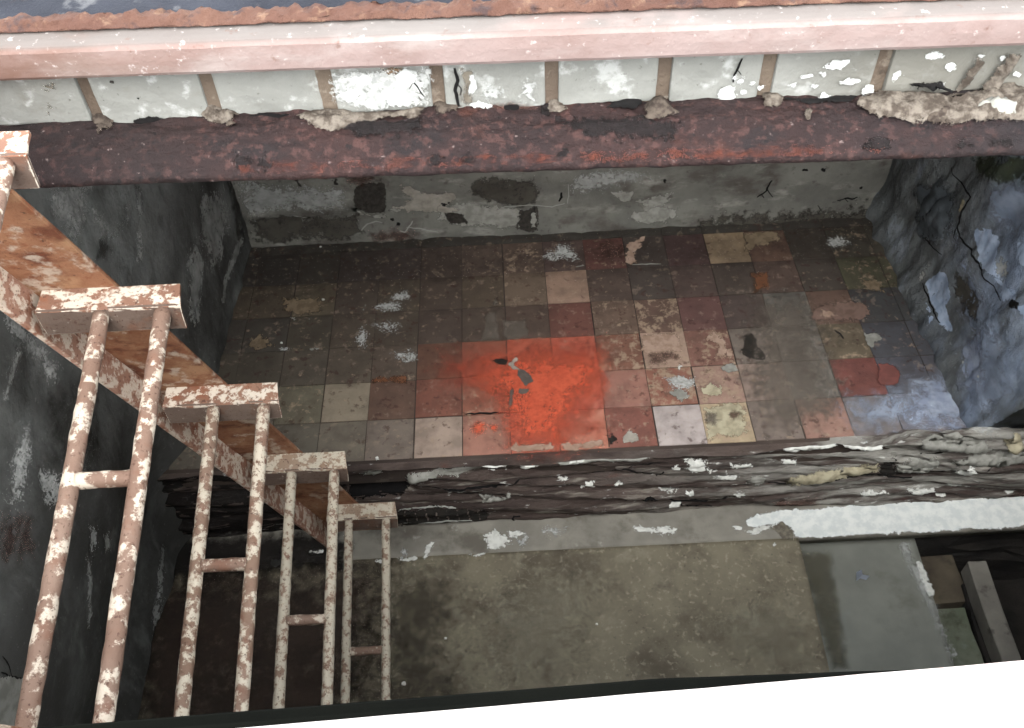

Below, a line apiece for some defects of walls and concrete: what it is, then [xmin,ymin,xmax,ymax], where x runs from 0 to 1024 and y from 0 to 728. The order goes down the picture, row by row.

crack [453,68,462,107]
peeling [717,76,764,100]
peeling [784,59,874,104]
peeling [892,51,956,93]
corrosion [344,117,422,140]
corrosion [548,112,822,163]
flaking render [352,182,539,232]
crack [925,168,1001,301]
damp [732,381,1024,657]